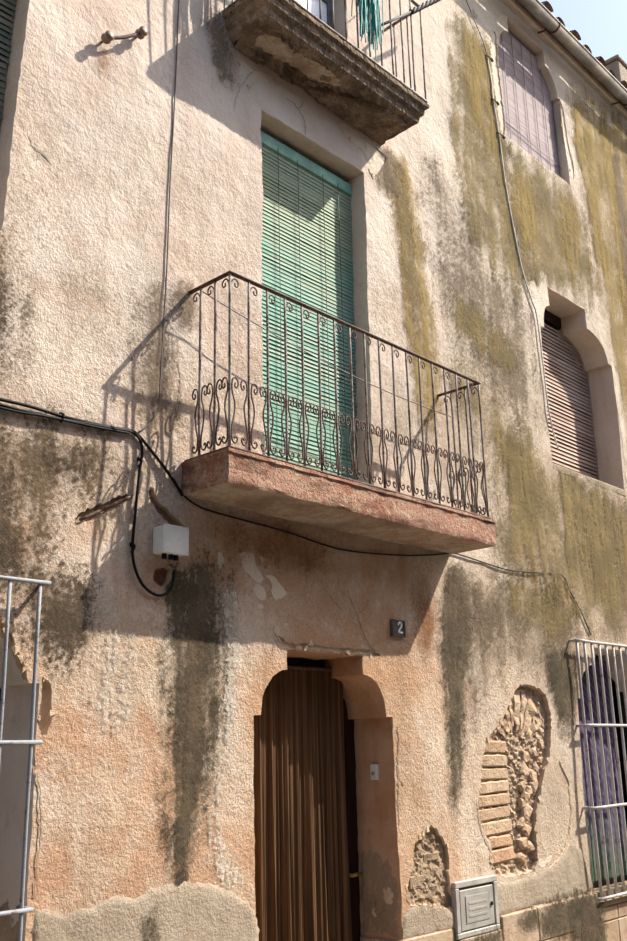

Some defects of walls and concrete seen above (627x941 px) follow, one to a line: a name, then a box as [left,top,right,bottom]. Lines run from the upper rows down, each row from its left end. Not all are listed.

leakage [201,8,238,90]
leakage [0,224,36,404]
leakage [372,8,627,817]
leakage [0,401,138,733]
peeling [240,552,286,609]
leakage [156,549,249,888]
spalling [478,684,552,885]
peeling [0,899,19,941]
spalling [361,825,452,938]
leakage [463,925,505,941]
leakage [519,886,608,941]